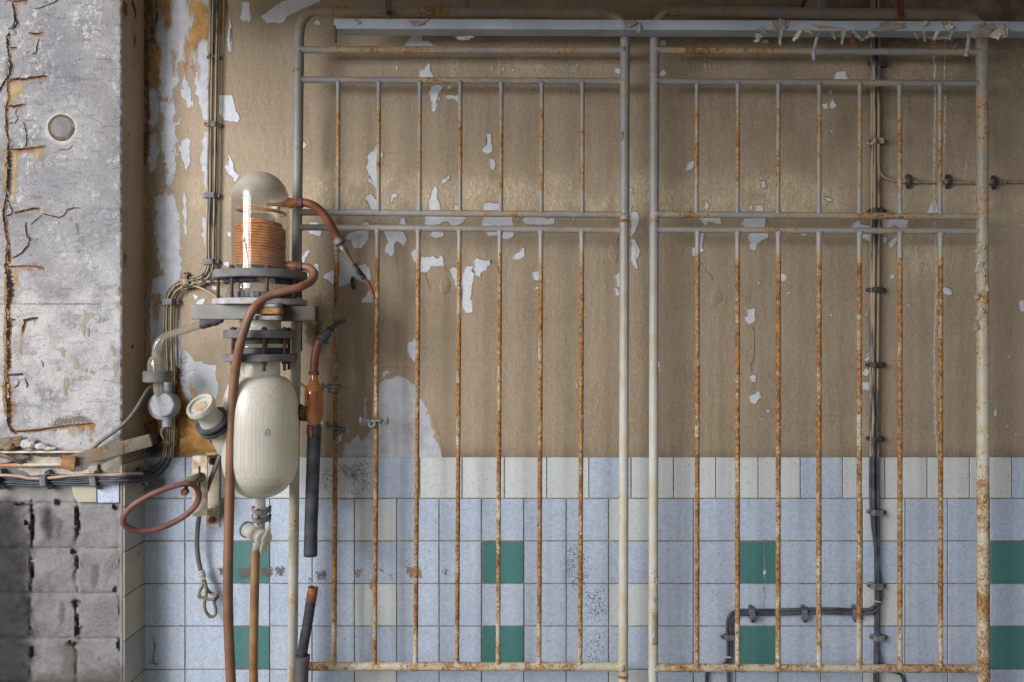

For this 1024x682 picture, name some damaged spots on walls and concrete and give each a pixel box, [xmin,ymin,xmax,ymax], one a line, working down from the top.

peeling [753,17,813,46]
peeling [831,20,954,45]
peeling [970,23,1009,41]
peeling [418,62,458,113]
peeling [822,70,849,110]
peeling [481,132,496,171]
crack [0,0,100,434]
peeling [146,0,241,402]
peeling [302,146,494,314]
peeling [423,174,556,261]
peeling [629,186,641,271]
peeling [338,370,443,457]